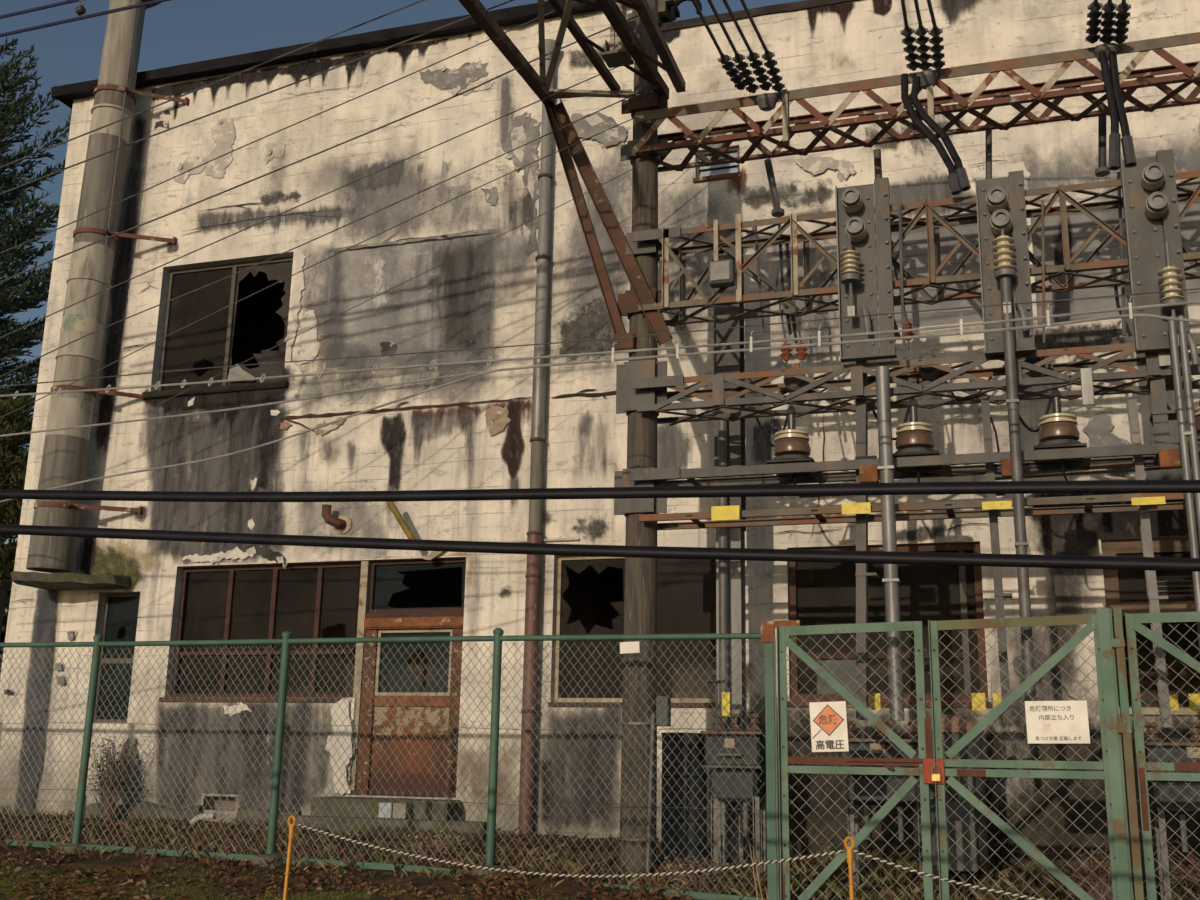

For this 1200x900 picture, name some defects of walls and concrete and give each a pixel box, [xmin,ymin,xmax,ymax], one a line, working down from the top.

leakage [569,42,610,70]
leakage [661,29,680,43]
leakage [807,2,853,32]
leakage [872,0,892,15]
leakage [96,117,145,450]
peeling [284,251,320,365]
leakage [304,175,533,506]
corrosion [412,400,531,420]
leakage [135,367,290,564]
peeling [181,519,287,569]
peeling [325,697,355,795]